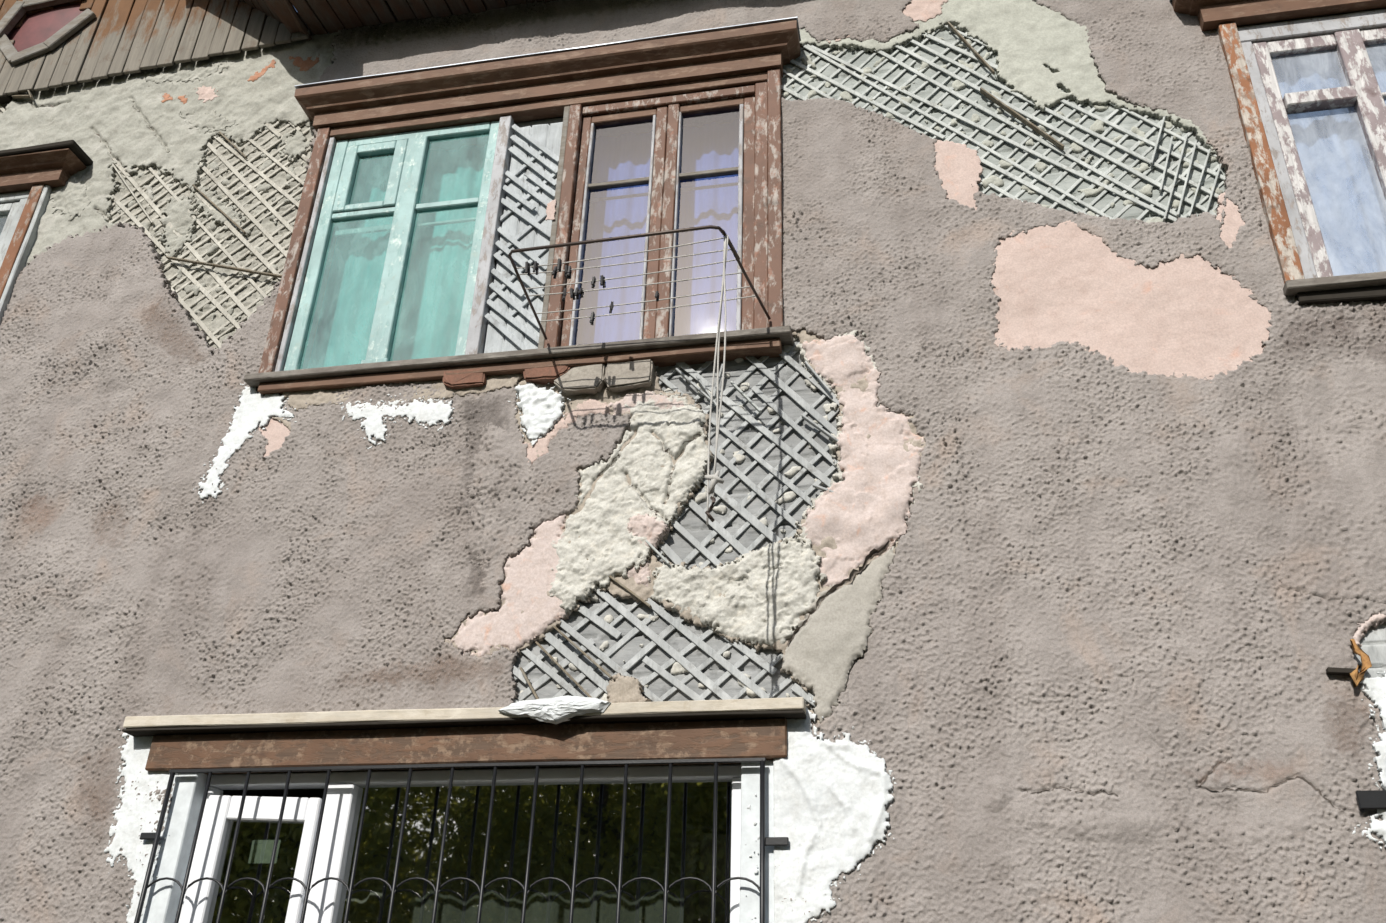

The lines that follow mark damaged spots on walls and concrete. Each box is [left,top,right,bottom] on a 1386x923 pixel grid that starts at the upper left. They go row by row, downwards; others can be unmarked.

flaking render [0,23,339,355]
flaking render [782,0,1272,383]
flaking render [258,387,355,457]
flaking render [390,329,926,724]
flaking render [1326,613,1386,688]
crack [1023,786,1118,796]
crack [1196,757,1346,809]